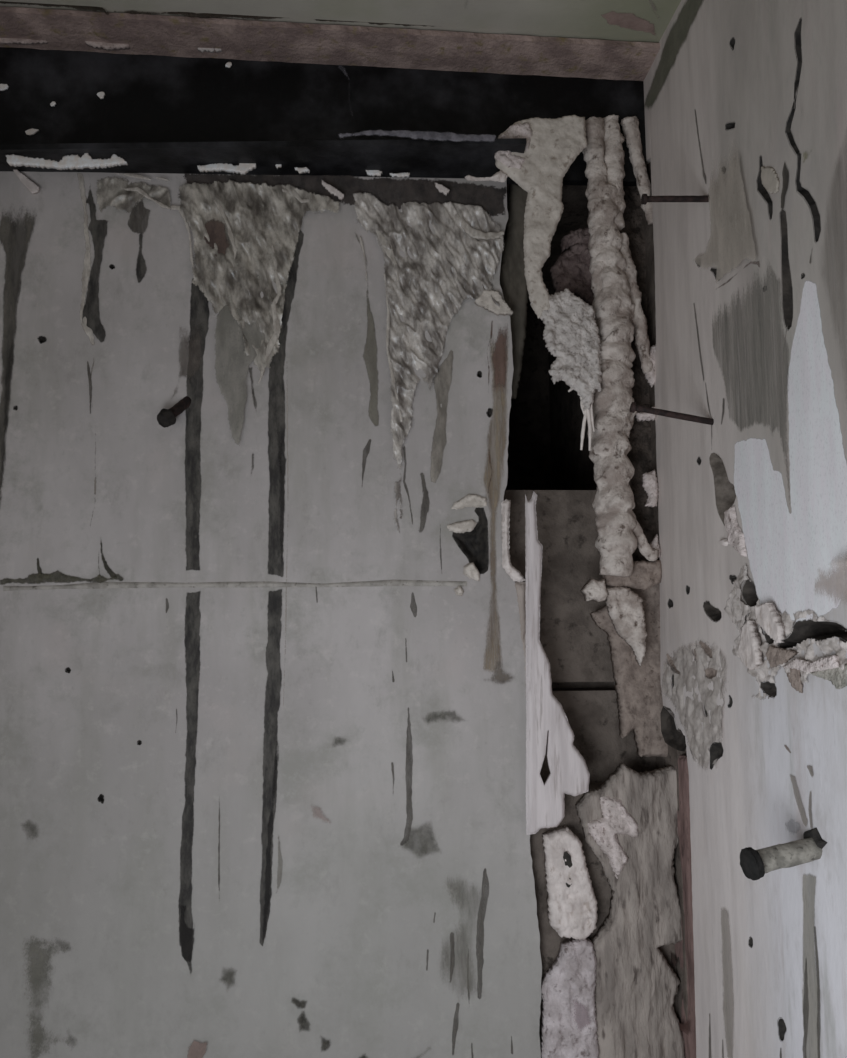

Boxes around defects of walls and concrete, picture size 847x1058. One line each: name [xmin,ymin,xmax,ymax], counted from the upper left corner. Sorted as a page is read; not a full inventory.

leakage [0,213,34,499]
leakage [78,173,107,345]
leakage [179,591,201,973]
leakage [174,279,209,570]
leakage [260,229,304,946]
peeling [96,173,513,532]
peeling [366,170,410,178]
spalling [440,494,489,596]
flaking render [660,273,847,1058]
crack [756,19,821,352]